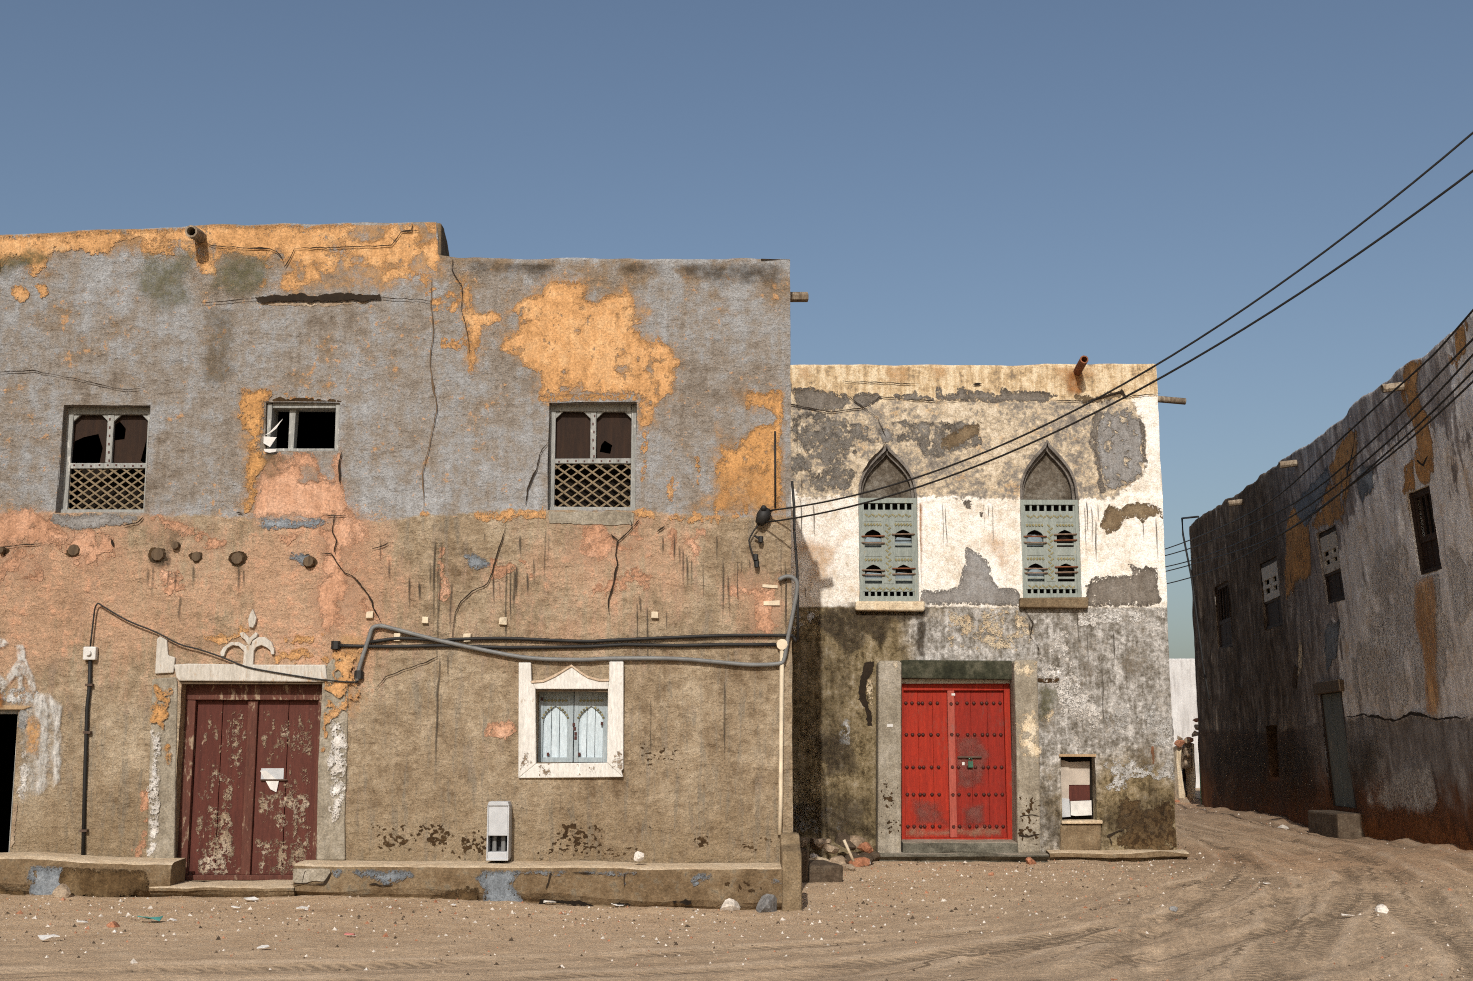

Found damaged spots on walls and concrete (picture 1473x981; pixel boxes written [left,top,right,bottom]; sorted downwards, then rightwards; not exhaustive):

crack [201,225,470,506]
flaking render [0,222,680,482]
flaking render [196,387,378,875]
crack [324,452,388,622]
crack [608,520,664,615]
water stain [817,736,855,774]
flaking render [579,383,1163,596]
water stain [816,606,928,655]
flaking render [920,547,1177,850]
flaking render [1284,428,1358,599]
water stain [1368,766,1436,812]
flaking render [1351,540,1473,717]